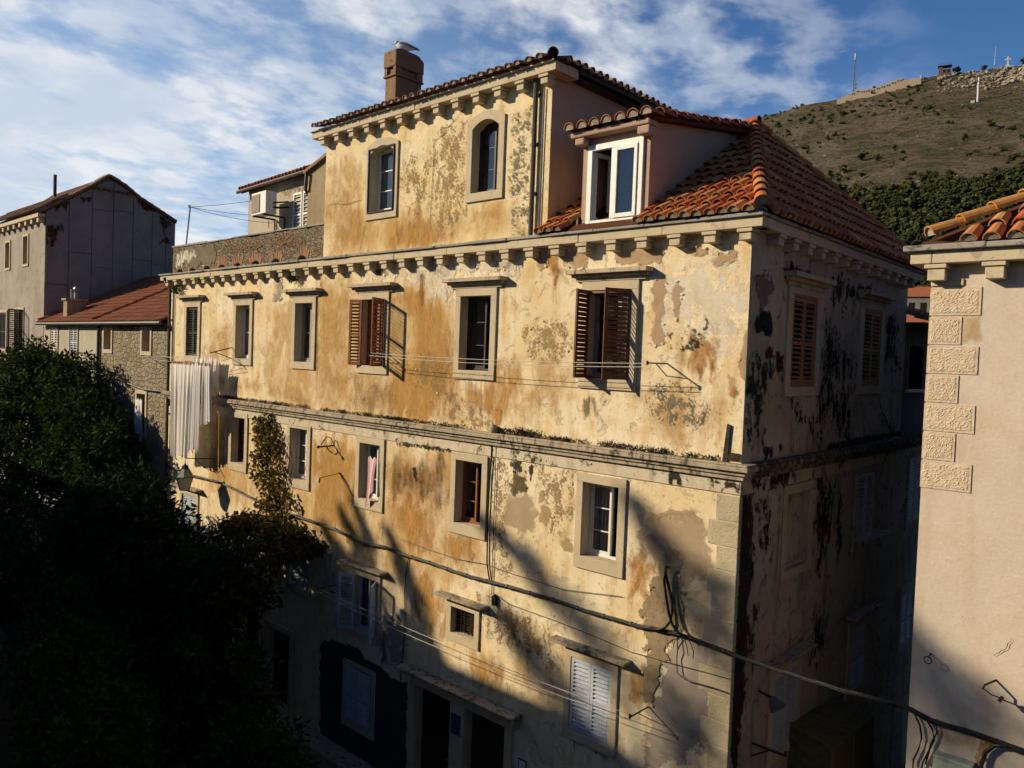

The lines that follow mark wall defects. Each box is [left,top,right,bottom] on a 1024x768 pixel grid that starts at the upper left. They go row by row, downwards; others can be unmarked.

peeling [522,318,573,363]
peeling [614,245,775,380]
mould [746,309,784,460]
mould [788,273,883,451]
mould [885,309,902,377]
peeling [490,457,515,581]
peeling [537,464,575,536]
mould [813,476,845,579]
spalling [638,549,686,707]